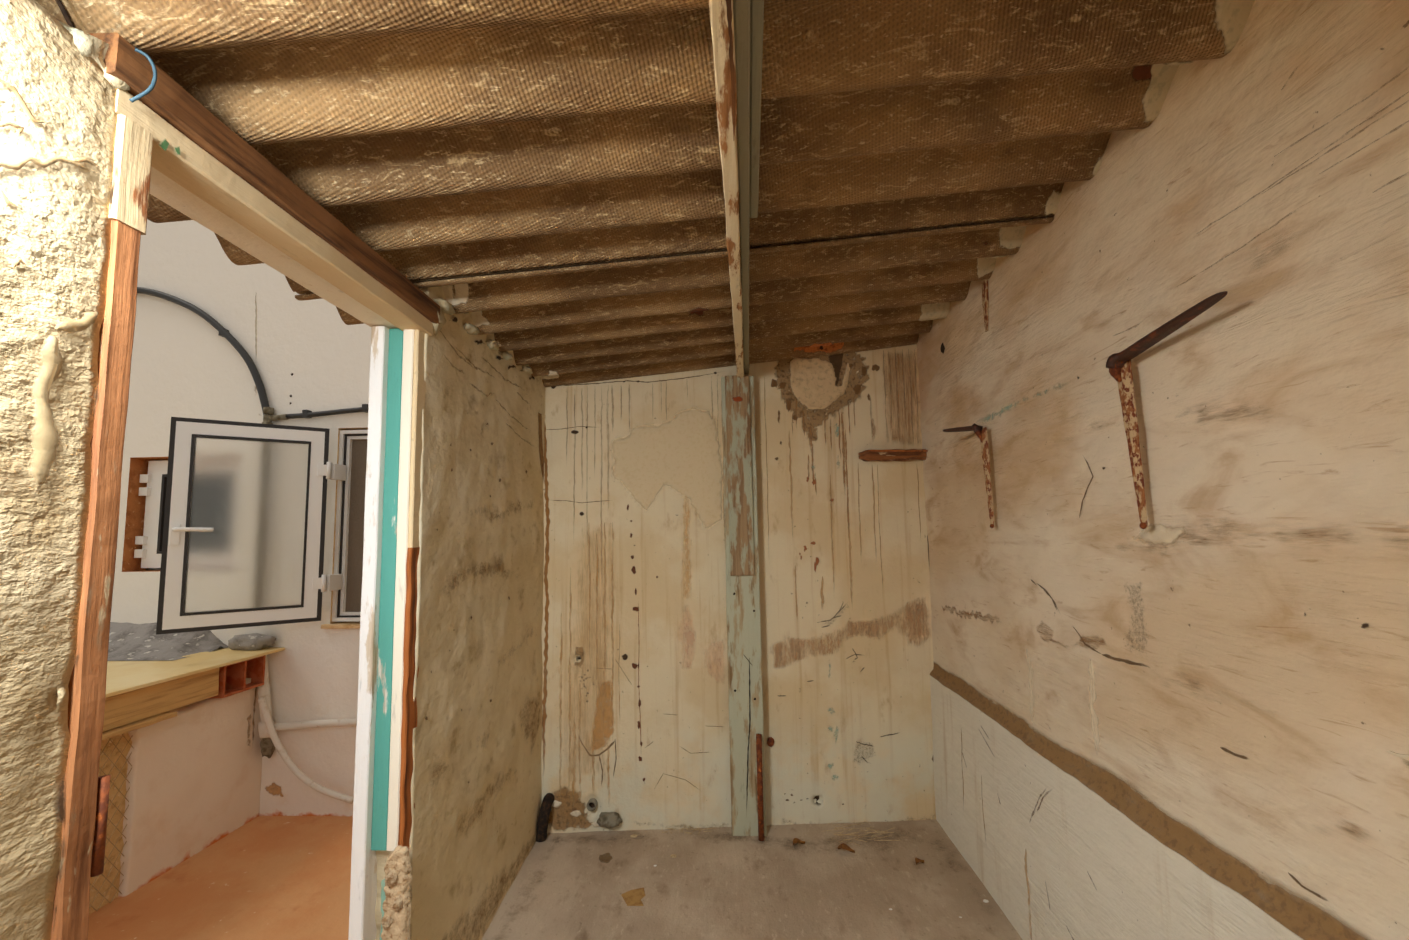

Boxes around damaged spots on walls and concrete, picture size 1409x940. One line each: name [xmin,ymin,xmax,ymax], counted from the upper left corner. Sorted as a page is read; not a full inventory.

crack [0,79,98,206]
spalling [771,352,880,441]
damp [775,602,926,666]
damp [942,606,993,623]
damp [559,654,620,795]
spalling [548,787,600,831]
spalling [380,846,412,940]